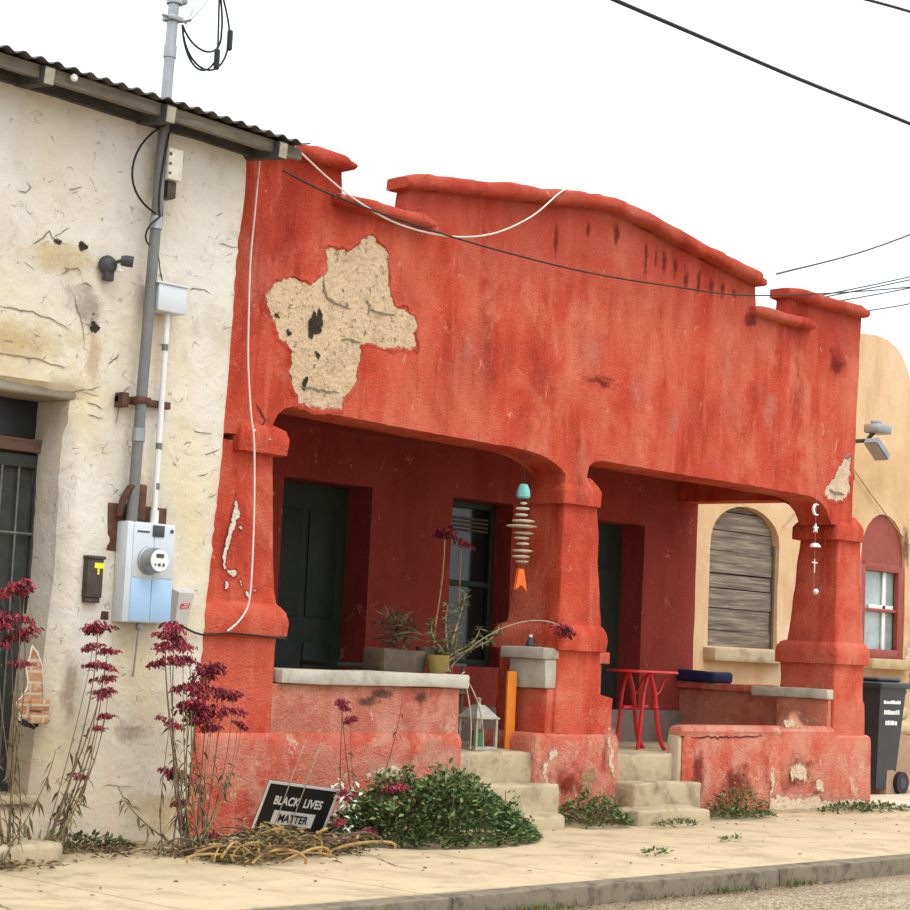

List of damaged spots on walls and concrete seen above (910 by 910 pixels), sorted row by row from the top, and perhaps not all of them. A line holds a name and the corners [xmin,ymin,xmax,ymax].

flaking render [261,230,421,415]
spalling [821,453,853,506]
peeling [222,493,258,599]
flaking render [768,755,868,810]